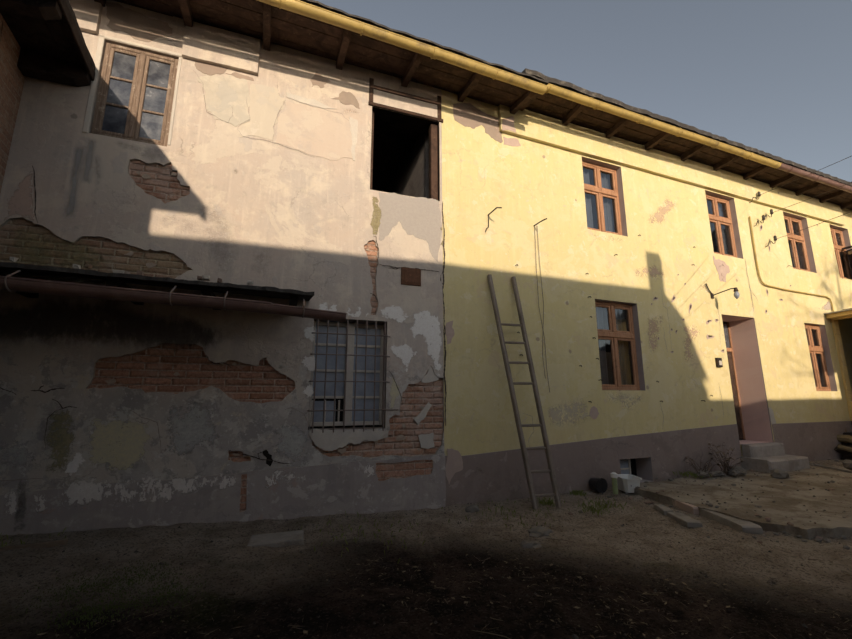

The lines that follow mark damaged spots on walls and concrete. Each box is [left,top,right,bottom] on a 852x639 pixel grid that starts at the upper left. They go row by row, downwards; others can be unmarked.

crack [193,70,342,157]
flaking render [129,160,190,204]
flaking render [0,218,192,286]
flaking render [364,241,378,315]
flaking render [87,344,295,403]
flaking render [309,367,443,481]